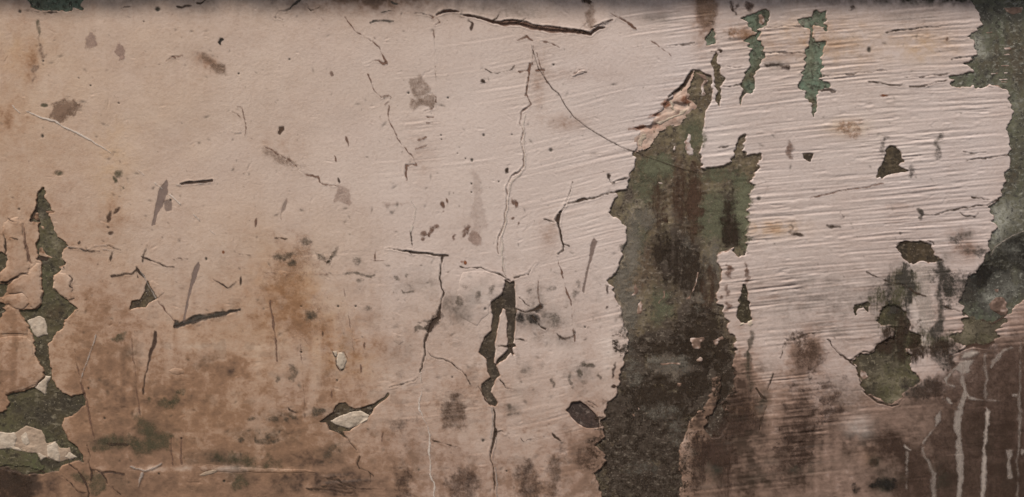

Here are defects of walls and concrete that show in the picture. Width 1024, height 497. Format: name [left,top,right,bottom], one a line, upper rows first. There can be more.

peeling [740,9,831,117]
peeling [876,146,908,179]
peeling [949,0,1024,346]
peeling [0,188,86,475]
crack [161,281,235,328]
peeling [321,392,389,437]
crack [394,9,670,497]
peeling [566,29,762,497]
peeling [852,302,922,404]
peeling [896,241,942,264]
leakage [853,234,1024,497]